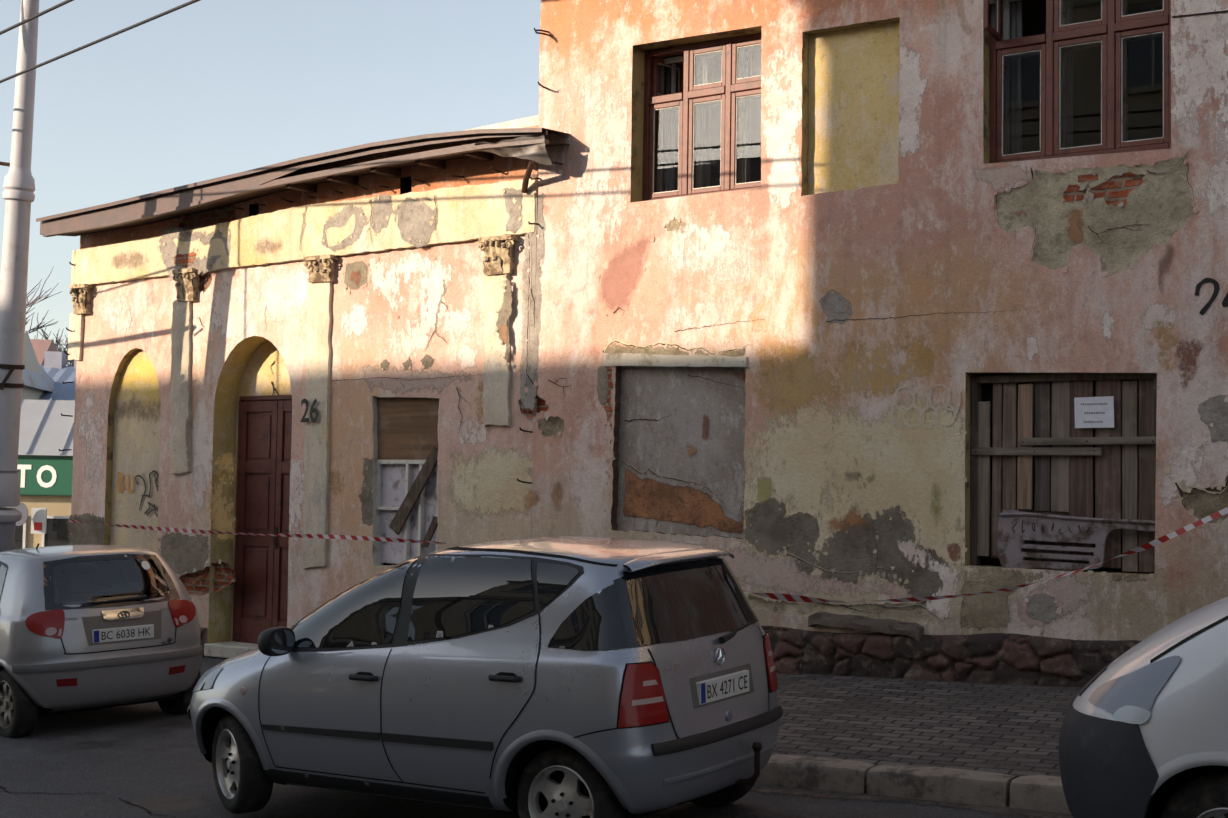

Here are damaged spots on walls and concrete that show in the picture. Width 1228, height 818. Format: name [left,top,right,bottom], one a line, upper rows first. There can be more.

spalling [993,0,1228,277]
peeling [159,204,309,341]
peeling [321,194,479,394]
peeling [495,68,632,438]
peeling [819,289,852,324]
spalling [179,559,236,597]
peeling [596,337,1062,634]
peeling [1159,395,1228,528]